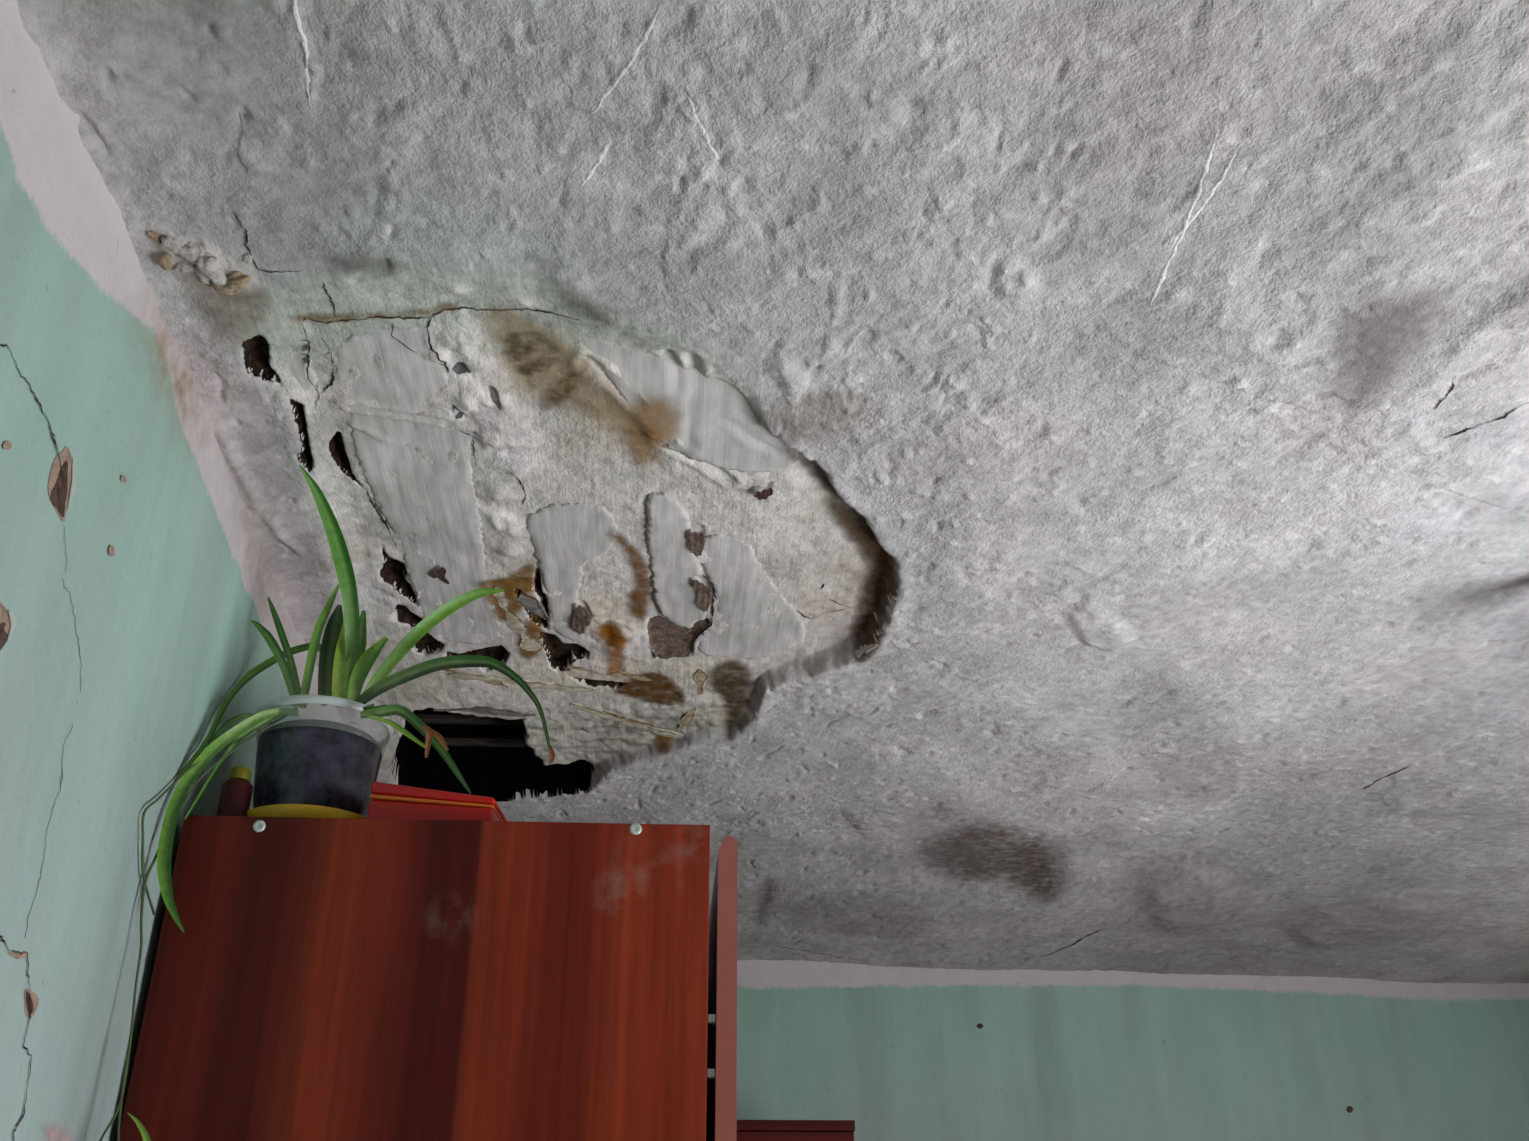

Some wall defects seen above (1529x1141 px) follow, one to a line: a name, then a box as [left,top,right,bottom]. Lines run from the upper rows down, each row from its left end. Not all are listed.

peeling [0,344,76,573]
spalling [146,230,908,796]
damp [501,324,630,430]
crack [1434,376,1527,438]
peeling [0,601,16,651]
crack [63,580,82,690]
crack [25,725,73,938]
damp [943,829,1054,890]
peeling [0,935,39,1140]